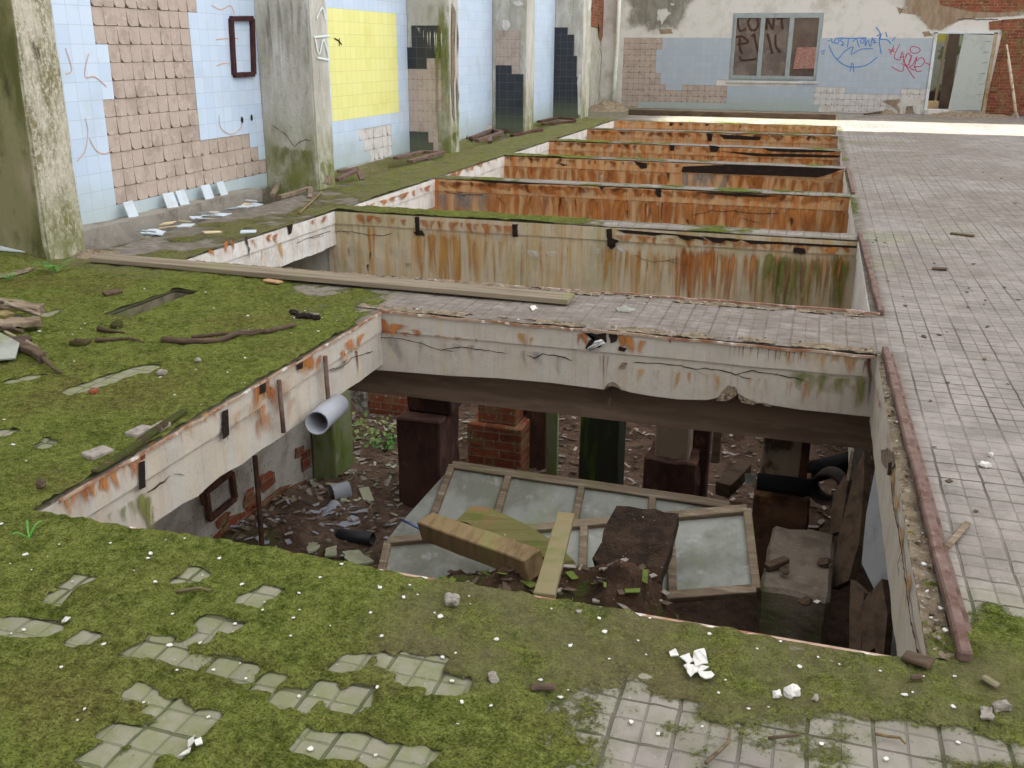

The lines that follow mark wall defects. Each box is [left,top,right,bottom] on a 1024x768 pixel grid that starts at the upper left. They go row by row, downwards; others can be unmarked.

peeling [90,0,267,205]
peeling [621,3,727,107]
flaking render [897,0,1024,117]
spalling [184,120,870,312]
rust [358,121,844,277]
rust [605,235,659,291]
damp [763,254,848,304]
rust [341,334,364,365]
crack [330,337,571,370]
rust [838,356,880,406]
rust [65,458,141,510]
spalling [39,312,926,657]